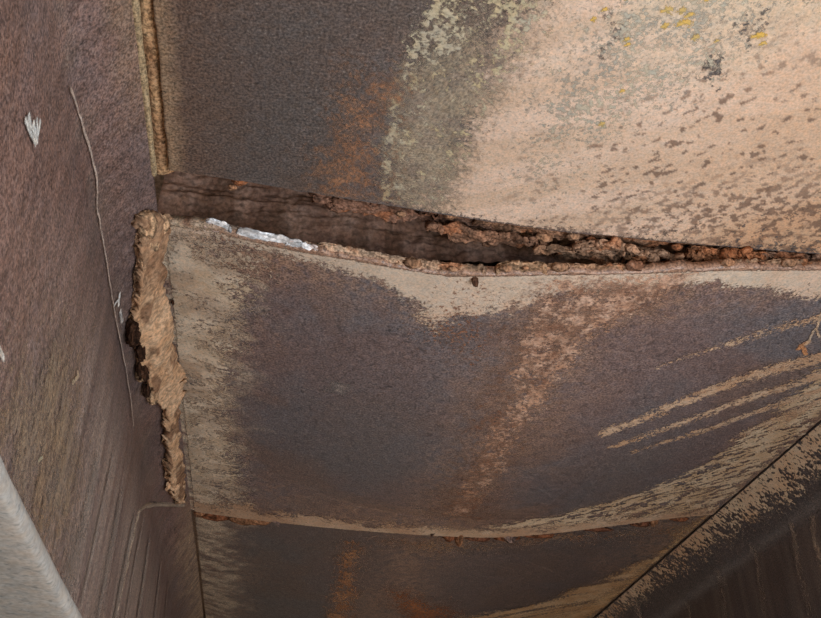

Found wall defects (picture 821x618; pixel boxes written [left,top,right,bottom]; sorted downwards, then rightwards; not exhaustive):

rust [312,82,401,198]
rust [390,0,821,254]
rust [194,272,821,618]